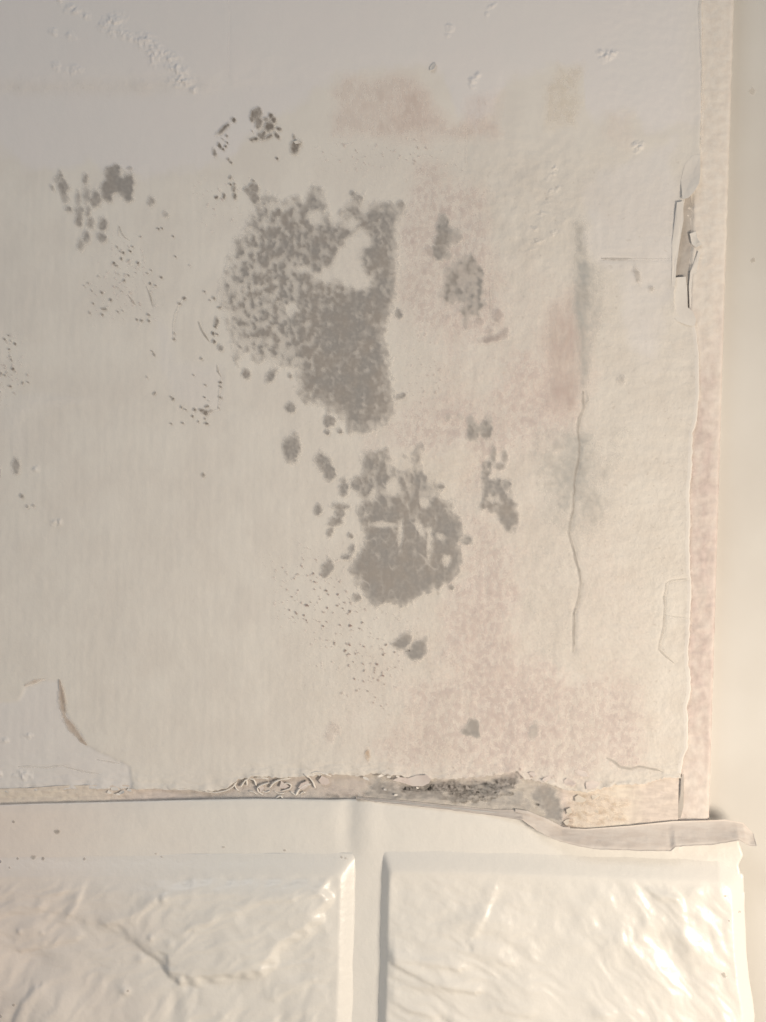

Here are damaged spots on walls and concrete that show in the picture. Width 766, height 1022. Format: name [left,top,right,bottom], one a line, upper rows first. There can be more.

leakage [213,117,236,164]
leakage [250,107,282,141]
leakage [51,164,163,322]
leakage [204,176,416,435]
leakage [409,206,508,344]
leakage [170,381,223,425]
spalling [0,154,756,851]
leakage [282,430,504,703]
leakage [452,417,519,532]
crack [569,391,589,652]